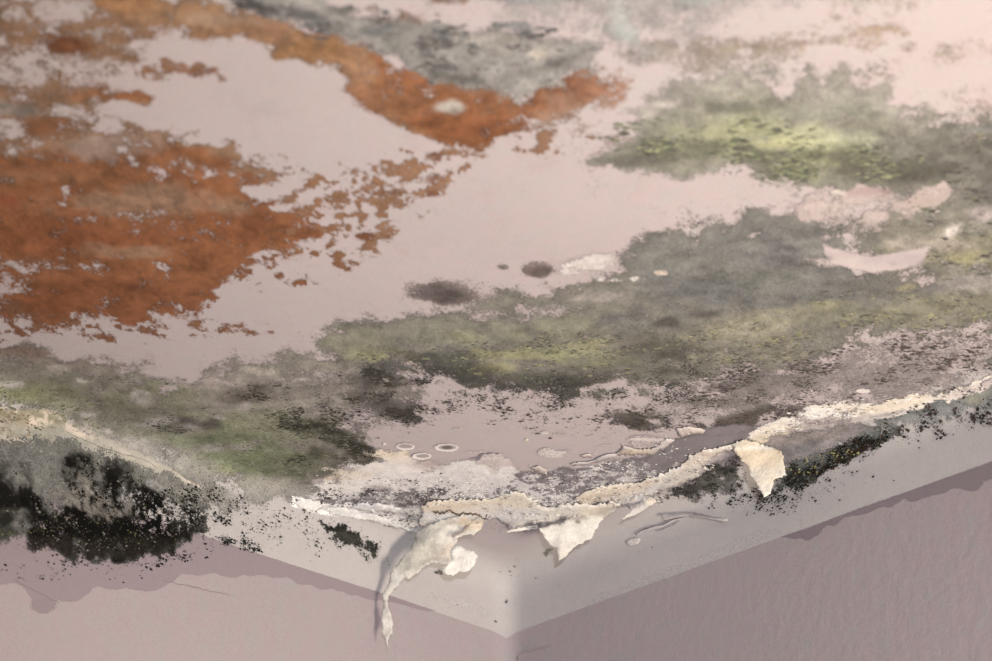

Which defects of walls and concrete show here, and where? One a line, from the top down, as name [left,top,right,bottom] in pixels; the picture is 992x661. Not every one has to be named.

corrosion [0,0,927,359]
damp [388,595,436,611]
flaking render [288,423,787,646]
damp [782,462,992,541]